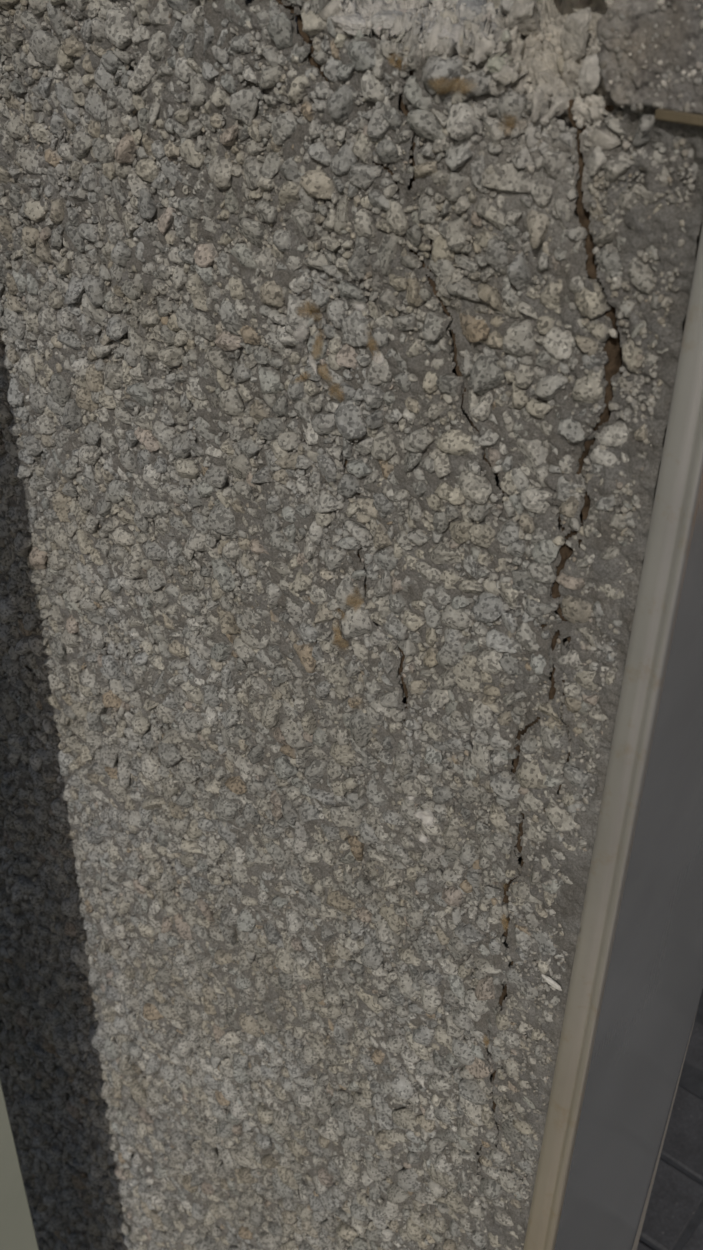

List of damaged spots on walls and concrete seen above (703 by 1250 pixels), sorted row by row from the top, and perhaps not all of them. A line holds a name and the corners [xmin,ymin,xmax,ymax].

crack [252,0,329,82]
crack [374,70,416,194]
spalling [319,0,622,153]
crack [410,239,504,503]
crack [512,99,623,790]
crack [397,641,408,721]
crack [499,813,524,1006]